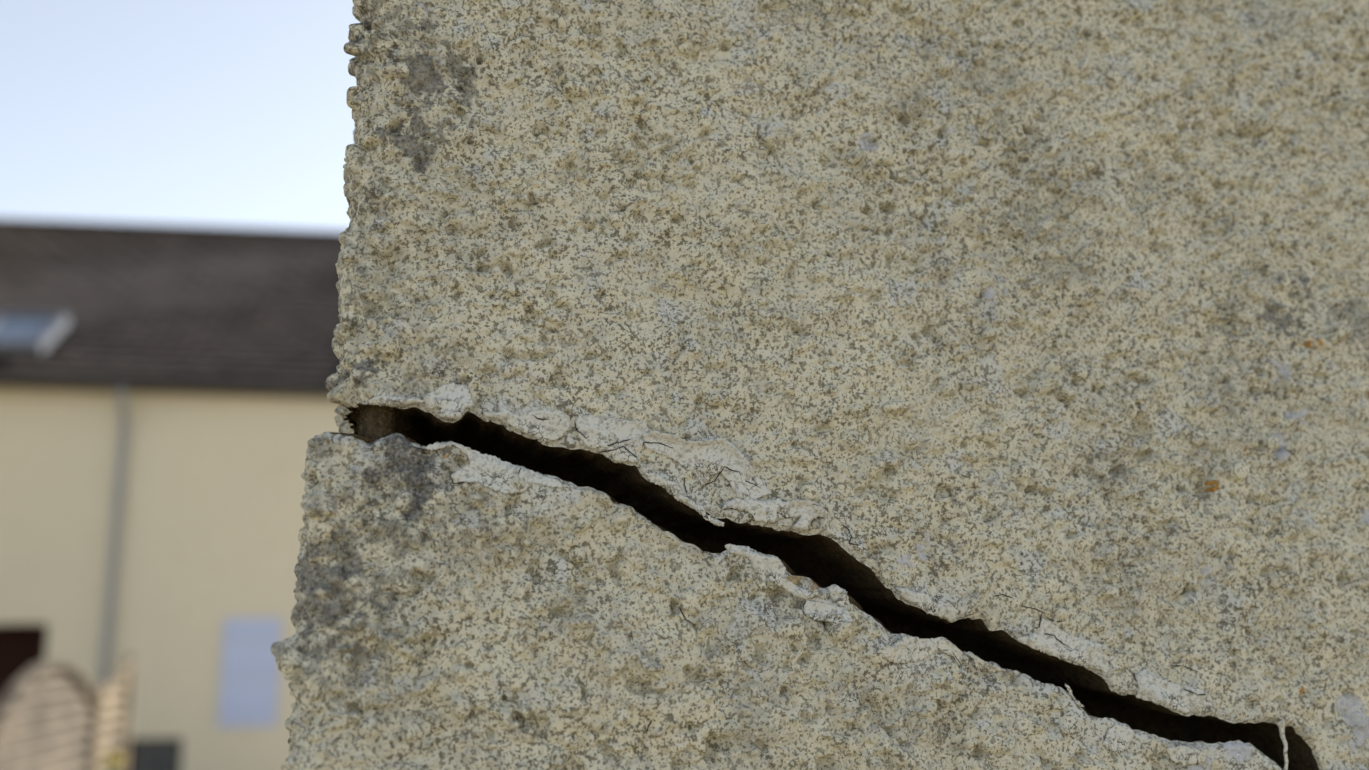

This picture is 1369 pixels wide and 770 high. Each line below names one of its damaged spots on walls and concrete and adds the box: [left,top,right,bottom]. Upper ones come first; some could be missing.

crack [329,403,1320,770]